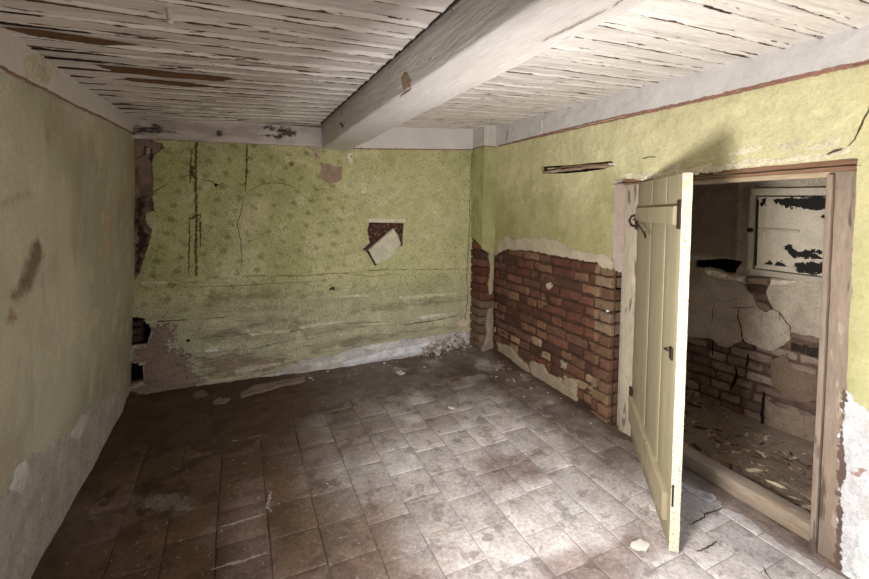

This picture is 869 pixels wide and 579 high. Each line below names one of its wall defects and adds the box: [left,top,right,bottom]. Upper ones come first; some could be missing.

peeling [1,27,136,46]
peeling [94,64,237,89]
crack [848,108,869,146]
flaking render [134,139,168,285]
peeling [760,195,826,219]
spalling [363,219,406,265]
peeling [765,244,823,276]
spalling [132,317,159,345]
flaking render [195,235,622,424]
crack [712,299,791,343]
peeling [0,362,145,579]
peeling [833,387,869,579]